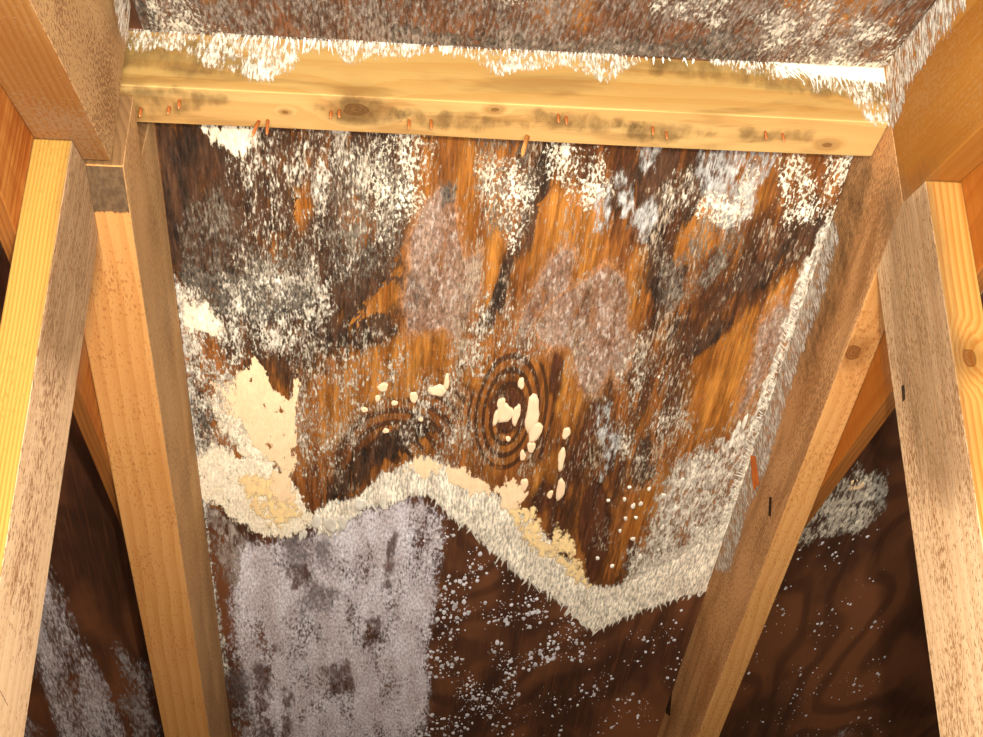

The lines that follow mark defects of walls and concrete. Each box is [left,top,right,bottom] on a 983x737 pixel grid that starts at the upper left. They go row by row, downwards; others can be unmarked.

leakage [114,0,966,127]
leakage [886,196,963,492]
leakage [155,123,853,737]
leakage [797,462,889,570]
leakage [36,571,163,737]